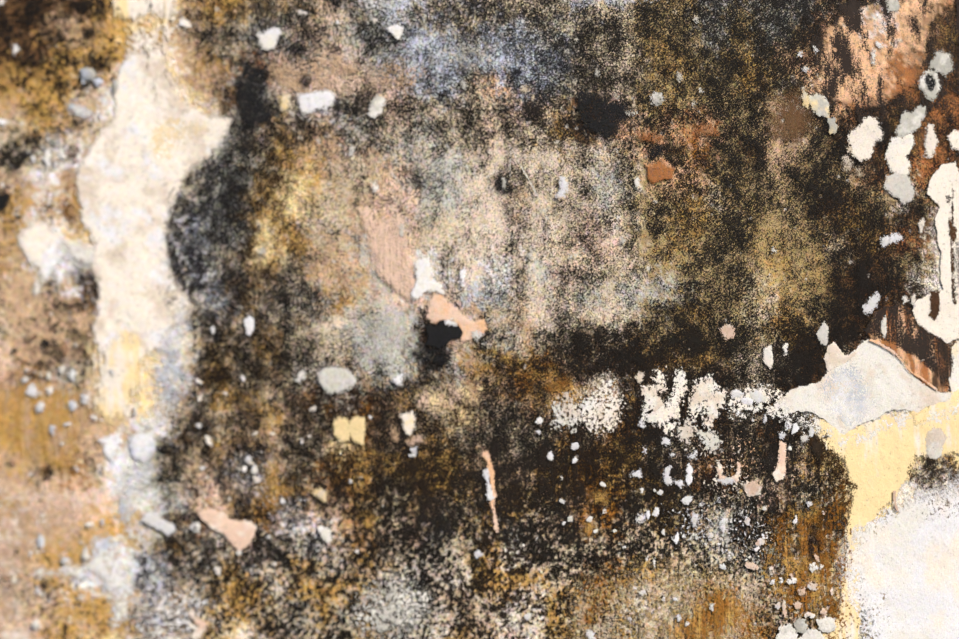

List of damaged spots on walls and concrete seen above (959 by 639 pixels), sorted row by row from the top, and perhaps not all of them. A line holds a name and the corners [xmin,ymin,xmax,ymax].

water stain [0,0,123,176]
water stain [0,182,22,217]
peeling [356,205,489,349]
water stain [434,190,489,315]
peeling [630,0,959,510]
water stain [0,269,100,481]
water stain [98,432,123,463]
water stain [906,453,959,518]